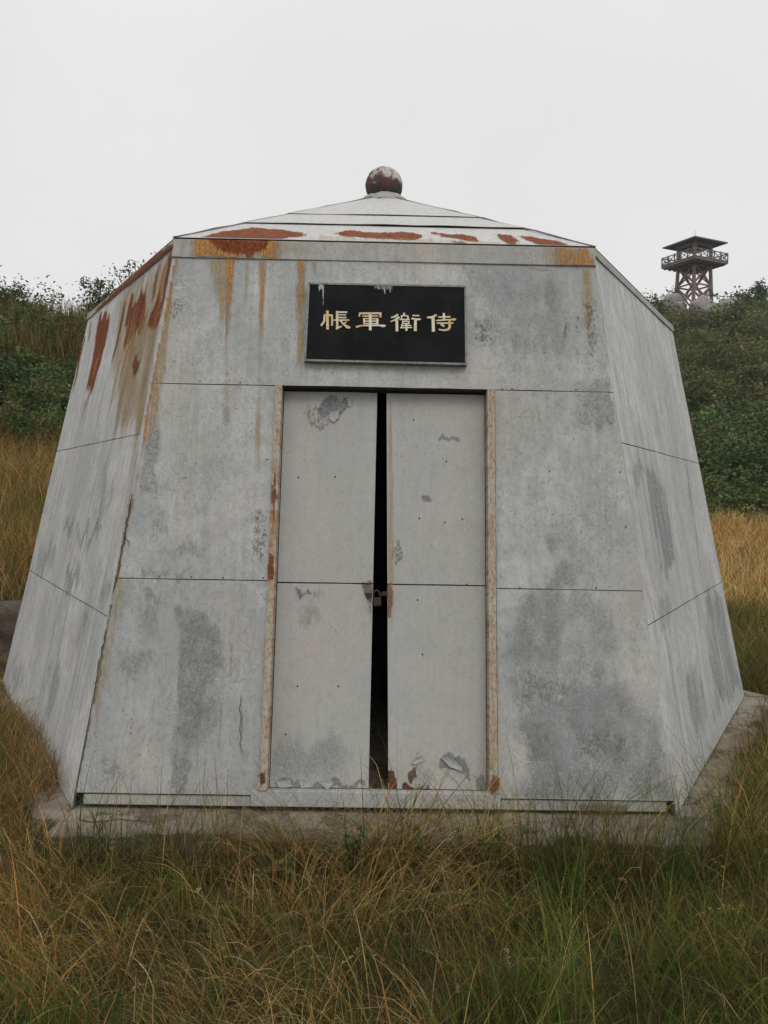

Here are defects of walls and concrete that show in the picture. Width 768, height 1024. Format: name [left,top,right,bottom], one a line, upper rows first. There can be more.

corrosion [72,244,178,442]
corrosion [194,227,306,325]
corrosion [336,230,478,243]
corrosion [498,234,598,356]
peeling [318,395,352,422]
corrosion [267,473,278,580]
water stain [172,607,221,794]
peeling [275,777,365,789]
peeling [439,752,486,790]